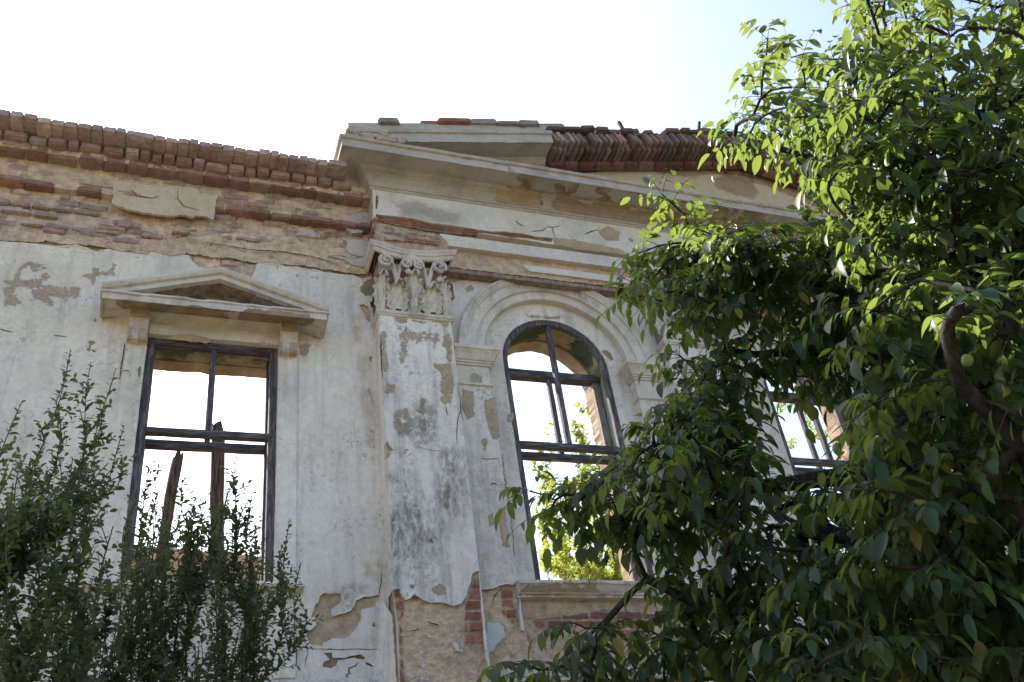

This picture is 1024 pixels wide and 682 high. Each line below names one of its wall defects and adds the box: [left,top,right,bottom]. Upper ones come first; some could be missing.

flaking render [0,138,634,322]
flaking render [495,161,768,228]
peeling [369,316,515,449]
flaking render [306,572,622,682]